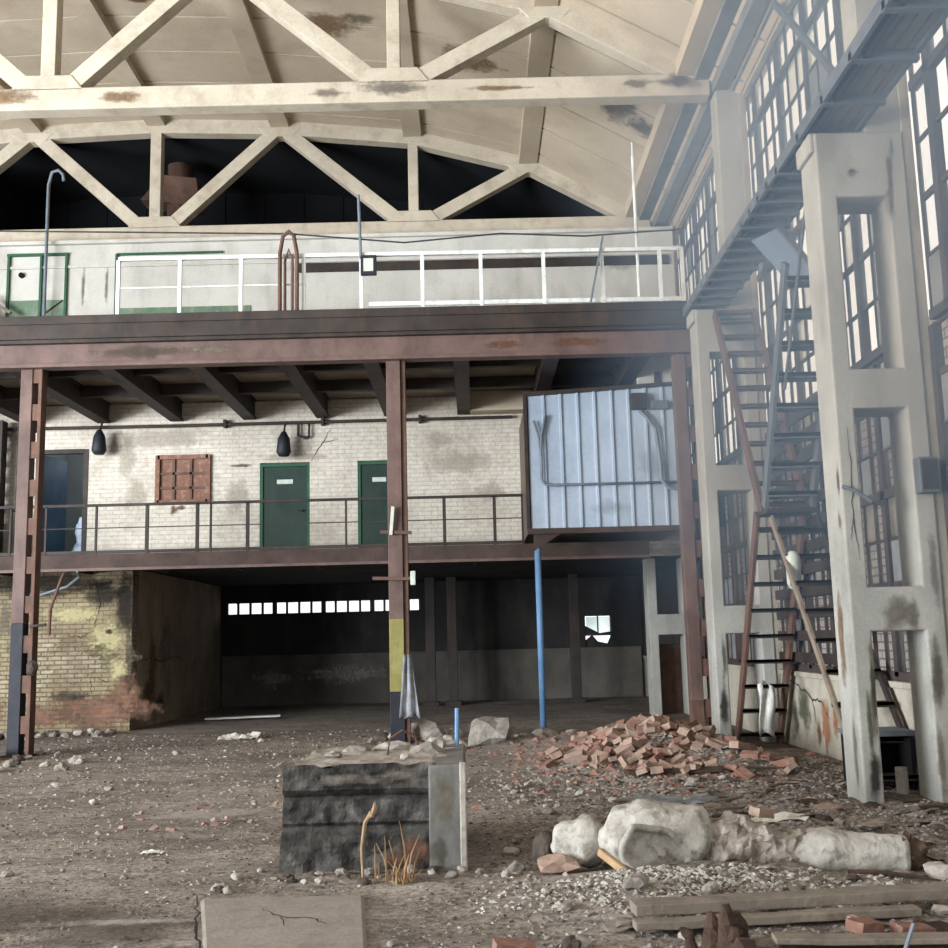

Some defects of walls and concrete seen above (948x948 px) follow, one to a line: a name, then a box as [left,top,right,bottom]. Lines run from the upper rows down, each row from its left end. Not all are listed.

damp [887,601,918,628]
peeling [0,671,9,718]
peeling [25,607,153,731]
damp [794,691,811,731]
damp [933,648,943,698]
damp [871,757,880,794]
damp [937,736,945,781]